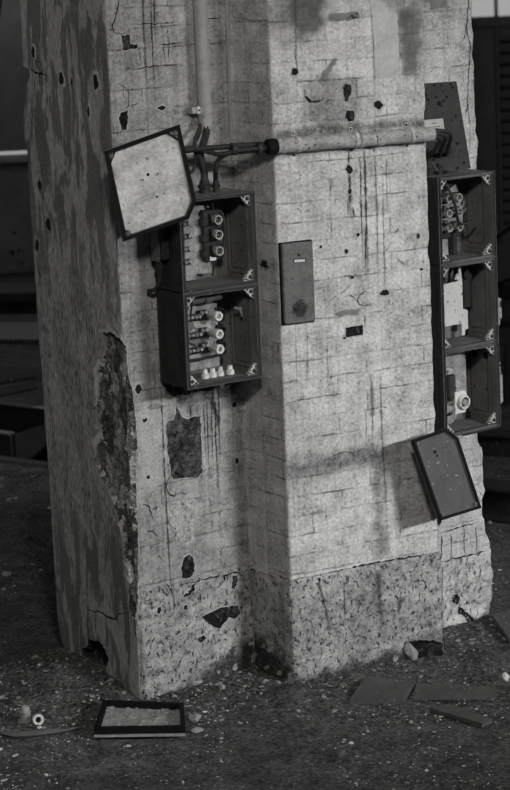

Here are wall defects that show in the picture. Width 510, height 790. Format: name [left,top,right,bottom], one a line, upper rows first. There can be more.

crack [112,1,182,111]
water stain [281,0,321,33]
water stain [399,11,420,72]
spalling [165,405,204,480]
spalling [93,328,150,620]
flaking render [168,499,196,611]
crack [87,609,130,639]
spalling [200,605,240,629]
spalling [81,638,109,672]